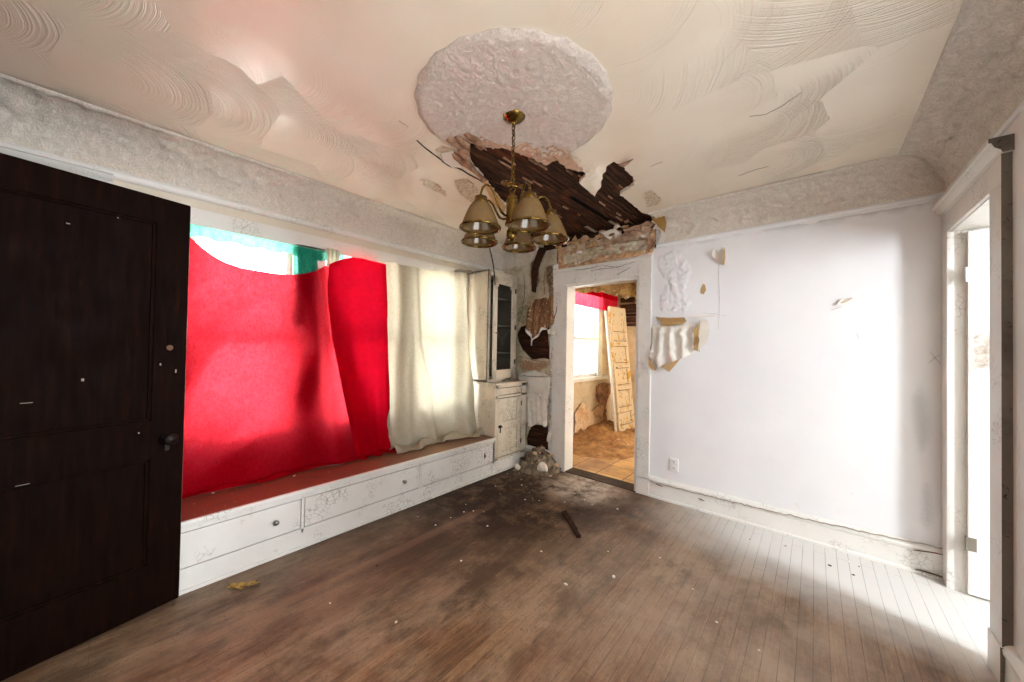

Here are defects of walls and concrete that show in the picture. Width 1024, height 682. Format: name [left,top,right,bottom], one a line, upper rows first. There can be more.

crack [399,121,483,183]
spalling [441,133,667,269]
peeling [518,295,557,359]
spalling [527,420,552,450]
crack [651,481,943,578]